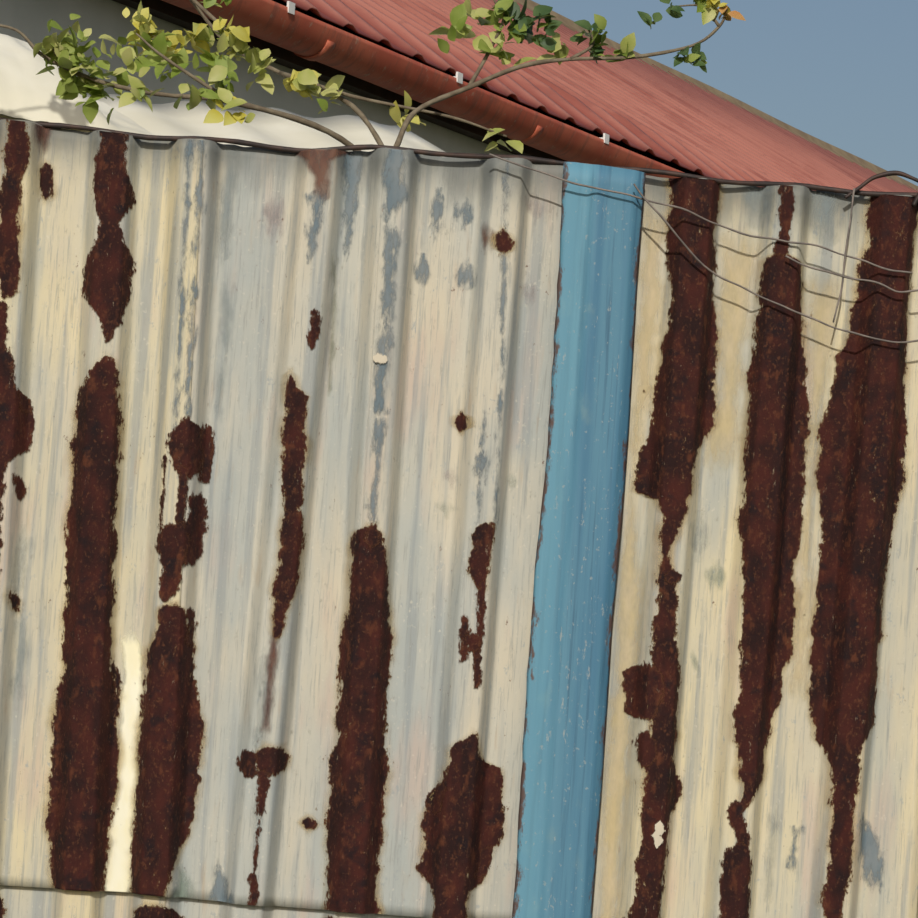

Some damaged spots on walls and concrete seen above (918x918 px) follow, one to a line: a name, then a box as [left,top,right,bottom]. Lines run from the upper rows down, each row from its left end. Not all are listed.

rust [0,119,50,555]
rust [39,162,54,200]
rust [81,131,137,343]
rust [45,355,125,892]
rust [129,416,215,918]
rust [235,744,291,906]
rust [265,374,310,726]
rust [301,523,394,918]
rust [415,731,505,918]
rust [458,522,497,688]
rust [620,177,722,918]
rust [719,185,918,918]